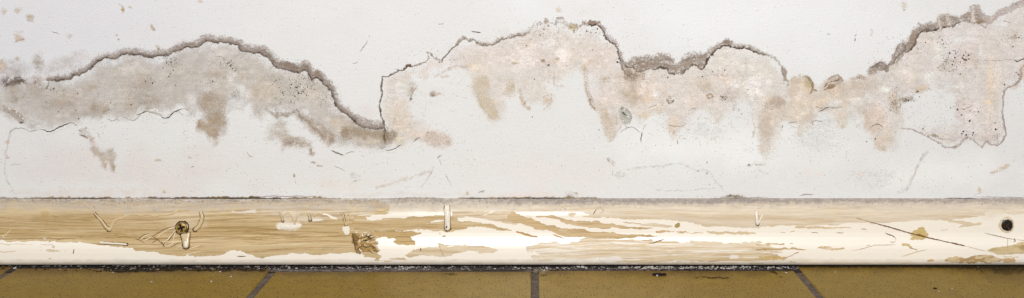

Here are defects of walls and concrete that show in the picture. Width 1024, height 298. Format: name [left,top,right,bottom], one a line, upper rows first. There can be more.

water stain [0,0,1024,171]
crack [108,108,188,121]
flaking render [619,107,632,124]
crack [9,122,76,135]
peeling [0,190,1024,265]